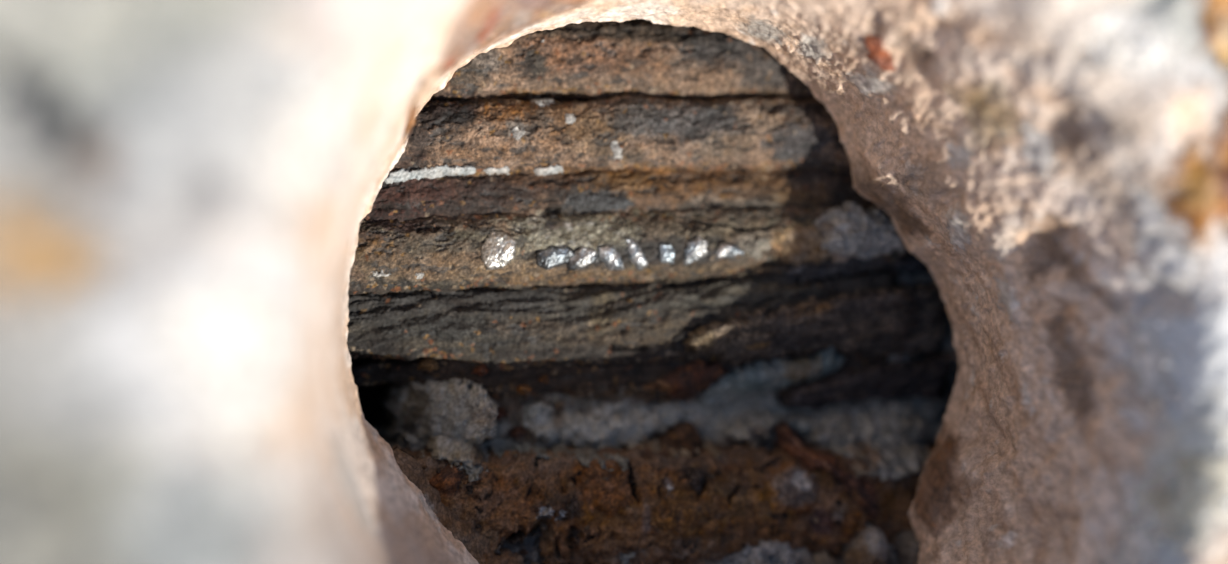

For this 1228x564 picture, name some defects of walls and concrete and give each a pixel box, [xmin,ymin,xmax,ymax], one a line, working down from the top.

water stain [693,346,845,408]
rust [575,462,635,518]
rust [763,459,820,522]
spalling [494,525,545,564]